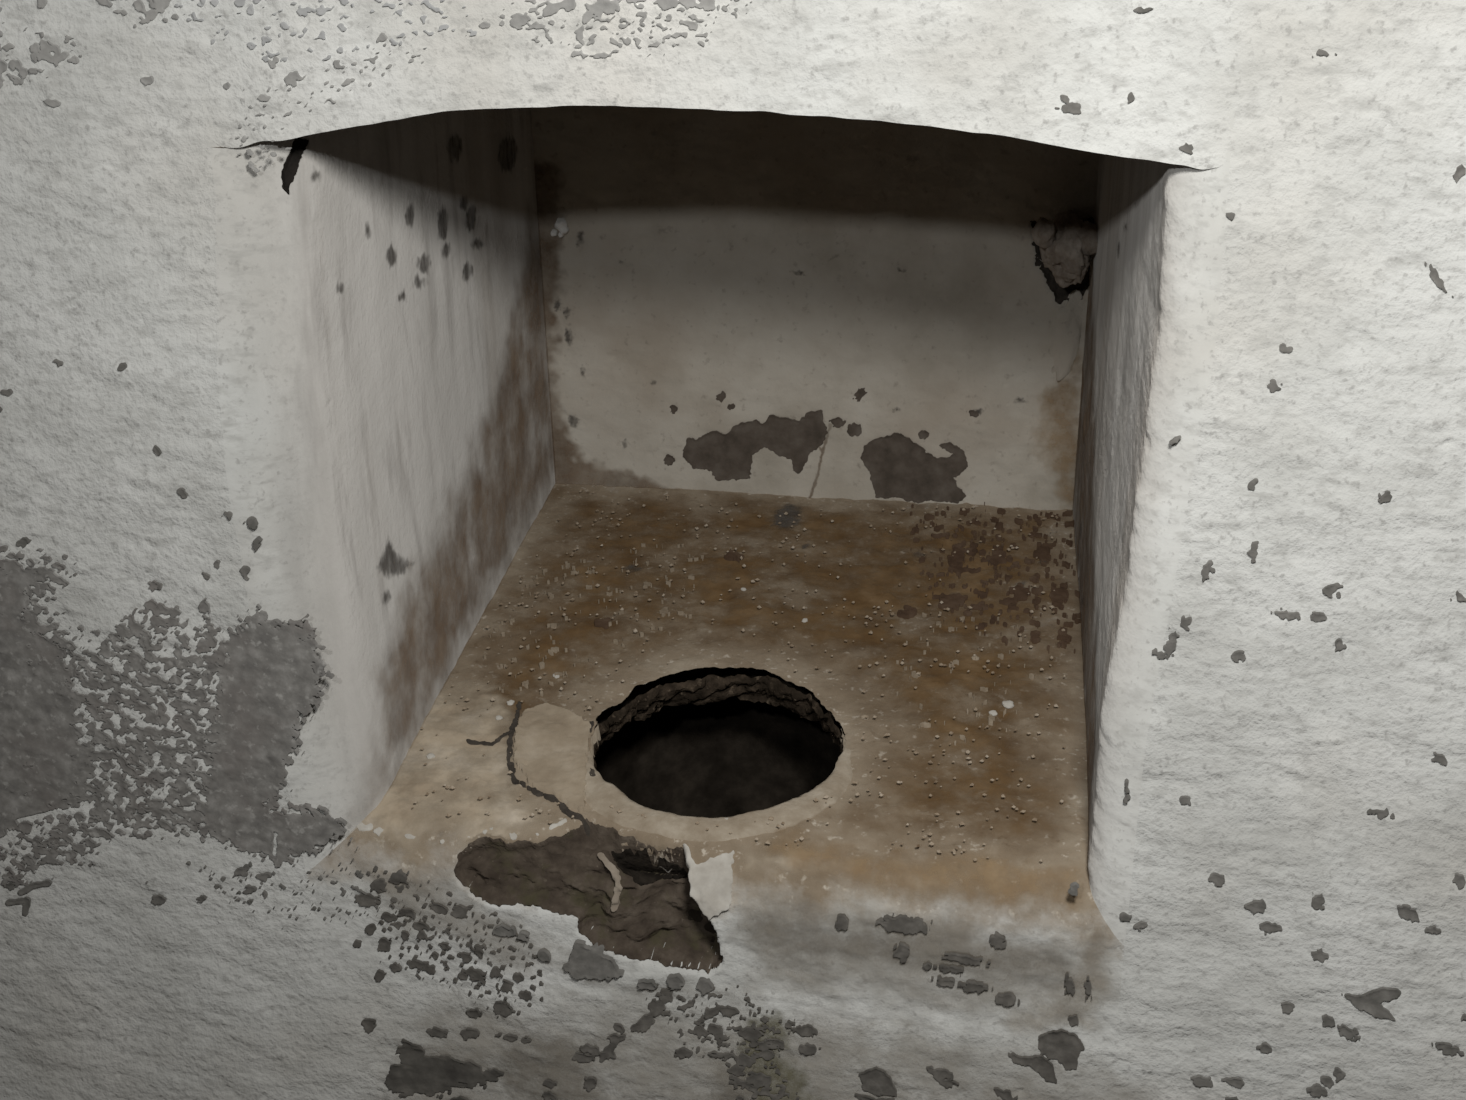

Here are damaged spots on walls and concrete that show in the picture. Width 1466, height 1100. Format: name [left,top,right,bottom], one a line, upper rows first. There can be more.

peeling [97,0,752,172]
spalling [221,511,263,580]
spalling [664,391,1082,733]
leakage [362,499,1057,847]
crack [466,701,590,836]
peeling [0,537,845,1100]
spalling [854,1066,897,1100]
peeling [1190,1075,1245,1100]
peeling [1306,1067,1346,1098]
peeling [1322,1014,1361,1041]
peeling [1341,987,1401,1021]
peeling [1431,1042,1464,1056]